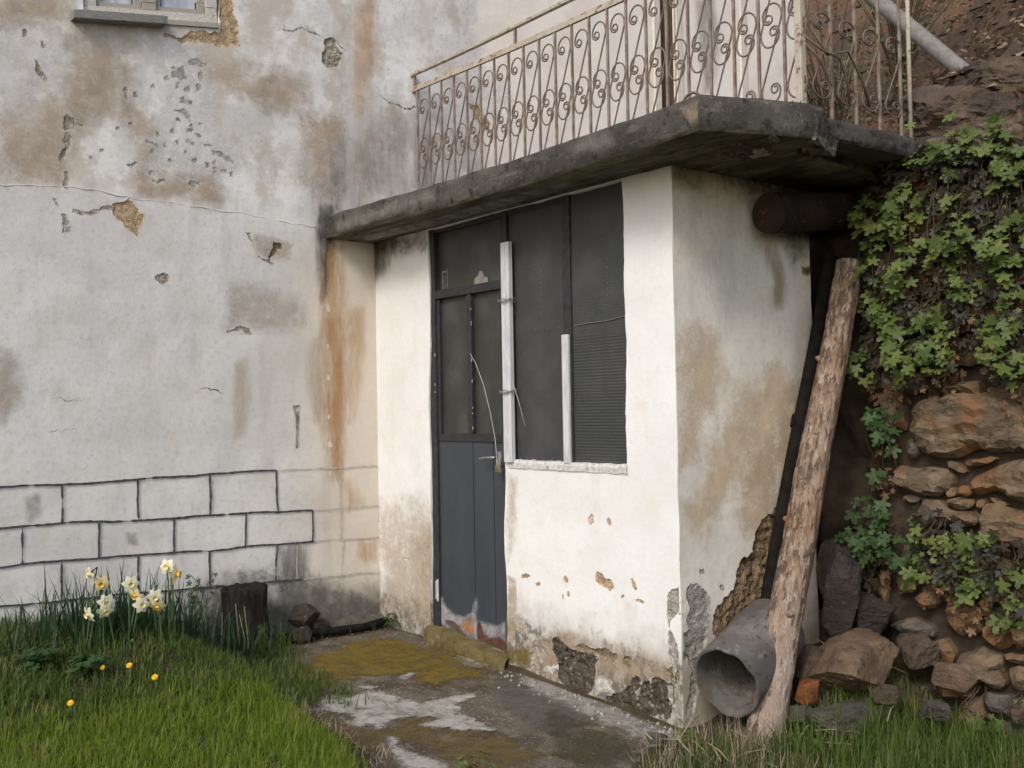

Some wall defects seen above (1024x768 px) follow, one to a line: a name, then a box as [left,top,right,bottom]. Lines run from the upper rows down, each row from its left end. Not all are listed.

flaking render [164,0,240,48]
spalling [279,24,346,69]
spalling [58,114,83,189]
peeling [145,58,234,177]
peeling [52,197,145,236]
spalling [258,241,288,266]
water stain [318,207,334,293]
corrosion [333,348,342,450]
water stain [687,369,799,530]
water stain [268,516,431,637]
corrosion [446,621,506,651]
spalling [530,507,776,725]